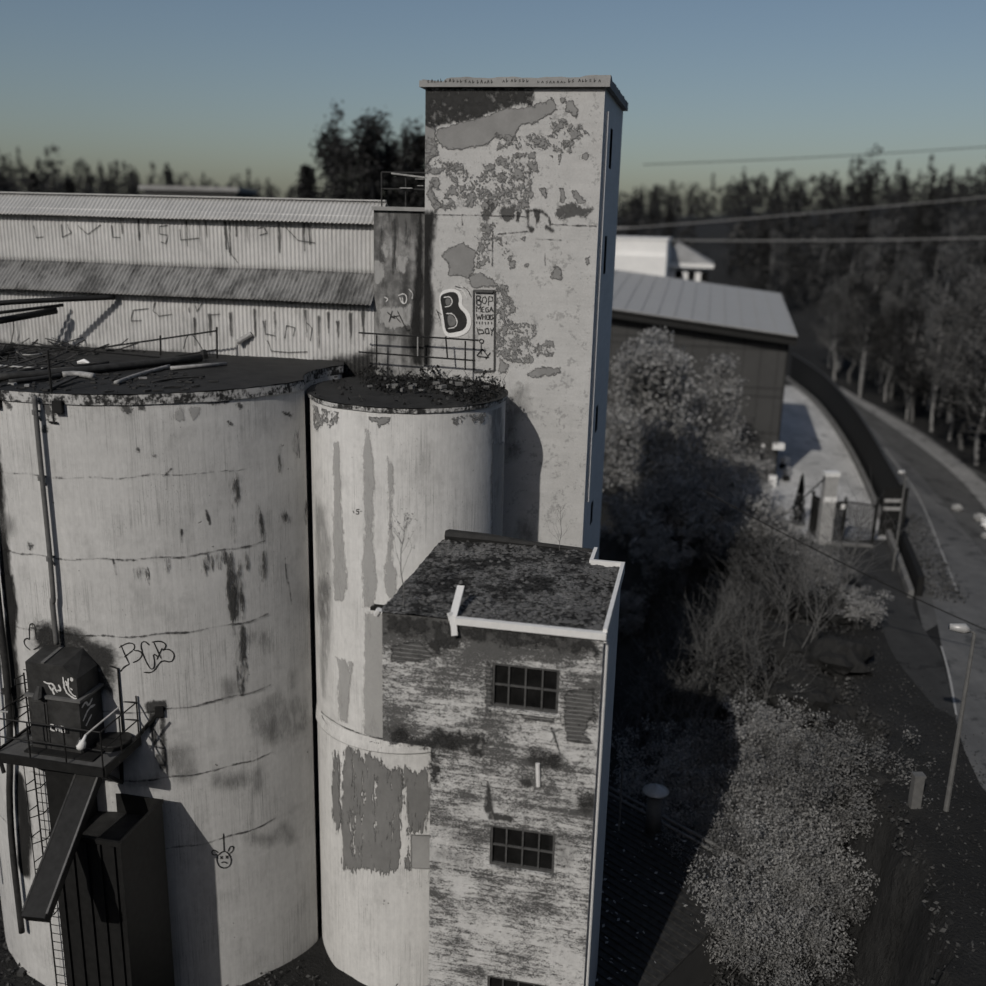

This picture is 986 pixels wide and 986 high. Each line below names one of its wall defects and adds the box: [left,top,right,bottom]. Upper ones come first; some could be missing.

damp [410,211,436,366]
spalling [425,97,593,378]
damp [0,463,23,725]
damp [333,442,347,601]
damp [362,429,601,784]
damp [15,772,31,877]
peeling [331,745,430,877]